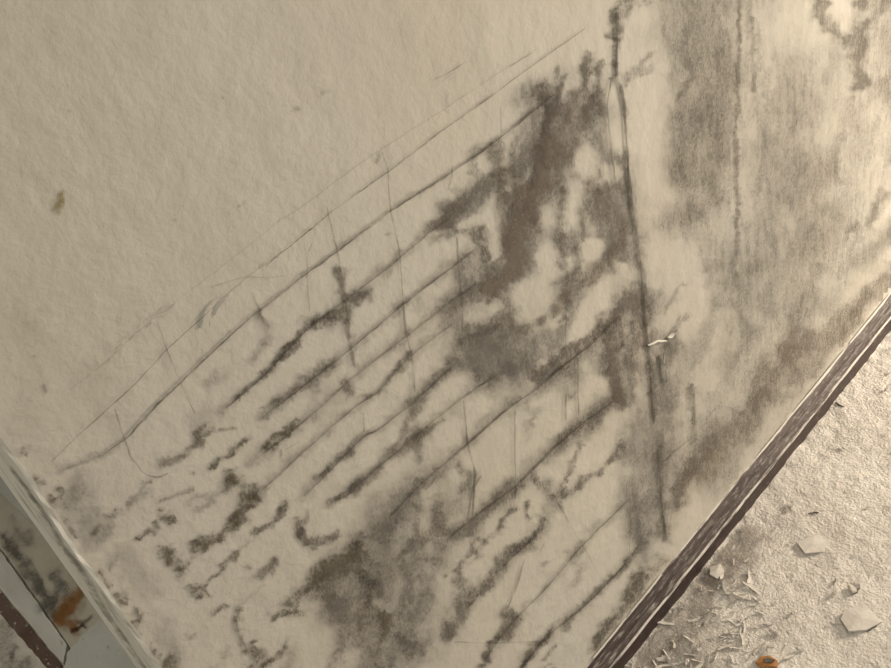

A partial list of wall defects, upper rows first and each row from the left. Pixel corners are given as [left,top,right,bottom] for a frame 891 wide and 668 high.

water stain [816,0,871,90]
crack [610,24,633,215]
crack [396,175,447,208]
crack [308,239,354,273]
water stain [428,53,656,445]
crack [231,311,331,404]
water stain [267,267,372,376]
crack [461,409,507,449]
water stain [531,275,891,578]
water stain [191,440,288,553]
rust [55,588,90,633]
water stain [272,482,423,667]